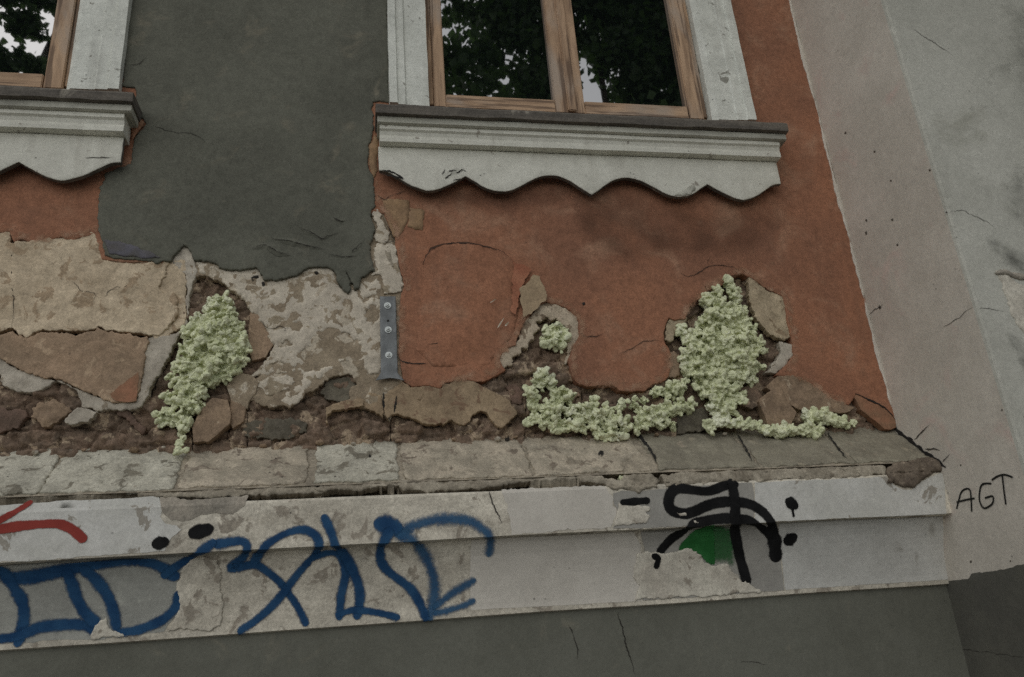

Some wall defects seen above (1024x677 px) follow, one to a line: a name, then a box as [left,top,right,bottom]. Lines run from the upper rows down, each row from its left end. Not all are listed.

peeling [0,197,896,459]
crack [894,426,950,468]
spalling [160,495,248,521]
peeling [633,548,761,601]